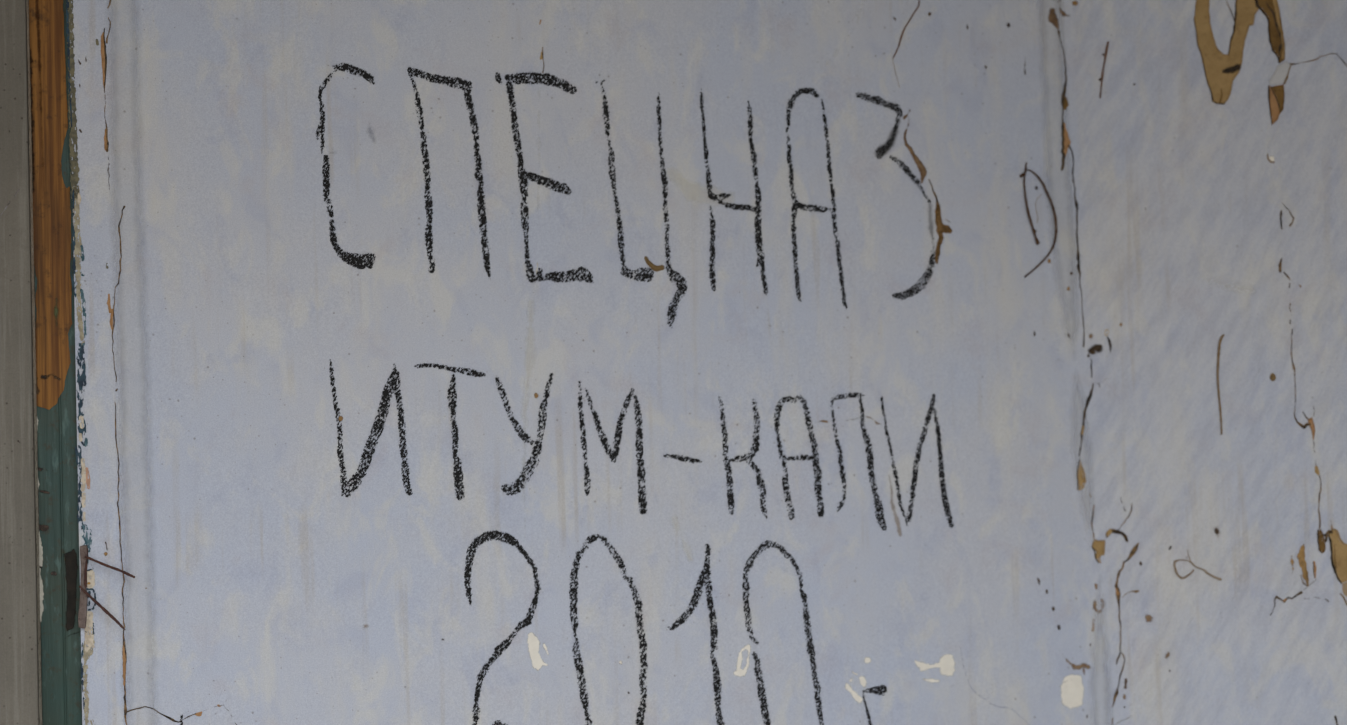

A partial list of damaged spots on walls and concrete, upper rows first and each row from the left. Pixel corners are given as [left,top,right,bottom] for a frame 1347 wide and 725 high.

peeling [1194,0,1285,105]
peeling [1268,84,1285,125]
crack [1283,53,1347,84]
crack [1057,30,1139,725]
crack [1270,203,1329,616]
peeling [1313,524,1347,605]
peeling [915,654,955,683]
peeling [1061,674,1084,709]